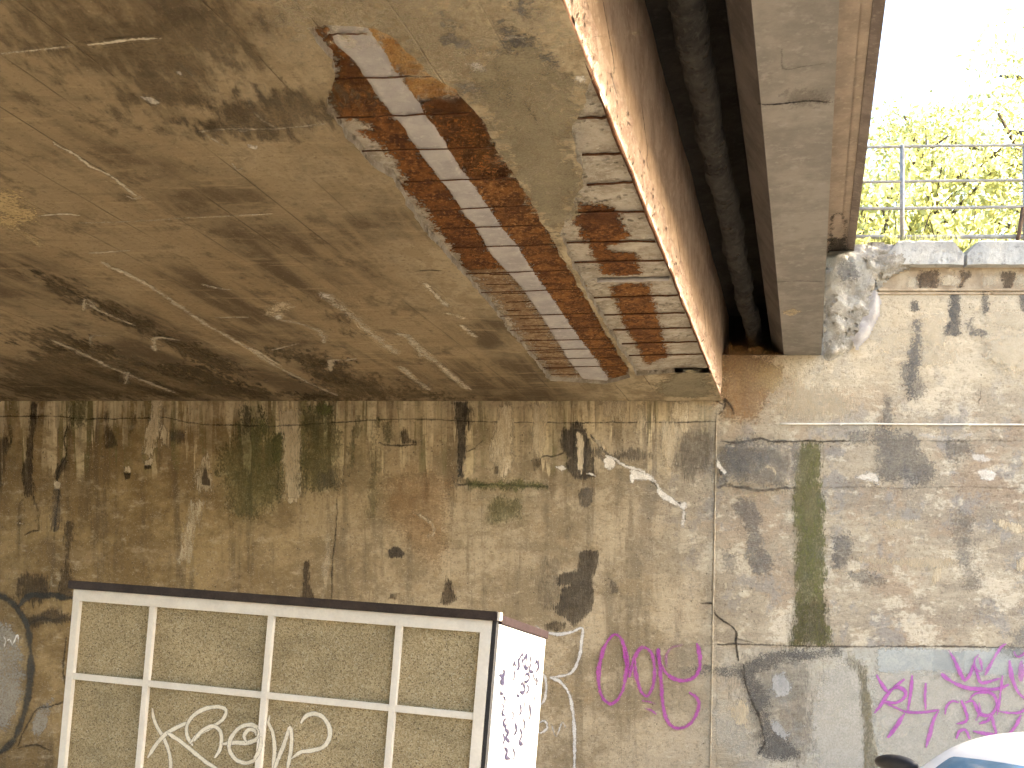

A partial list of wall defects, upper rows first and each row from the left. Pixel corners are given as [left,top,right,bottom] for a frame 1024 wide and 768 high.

crack [759,98,827,106]
spalling [307,0,722,394]
water stain [279,408,302,504]
water stain [532,401,689,525]
crack [717,484,796,496]
crack [725,436,847,444]
water stain [546,550,599,631]